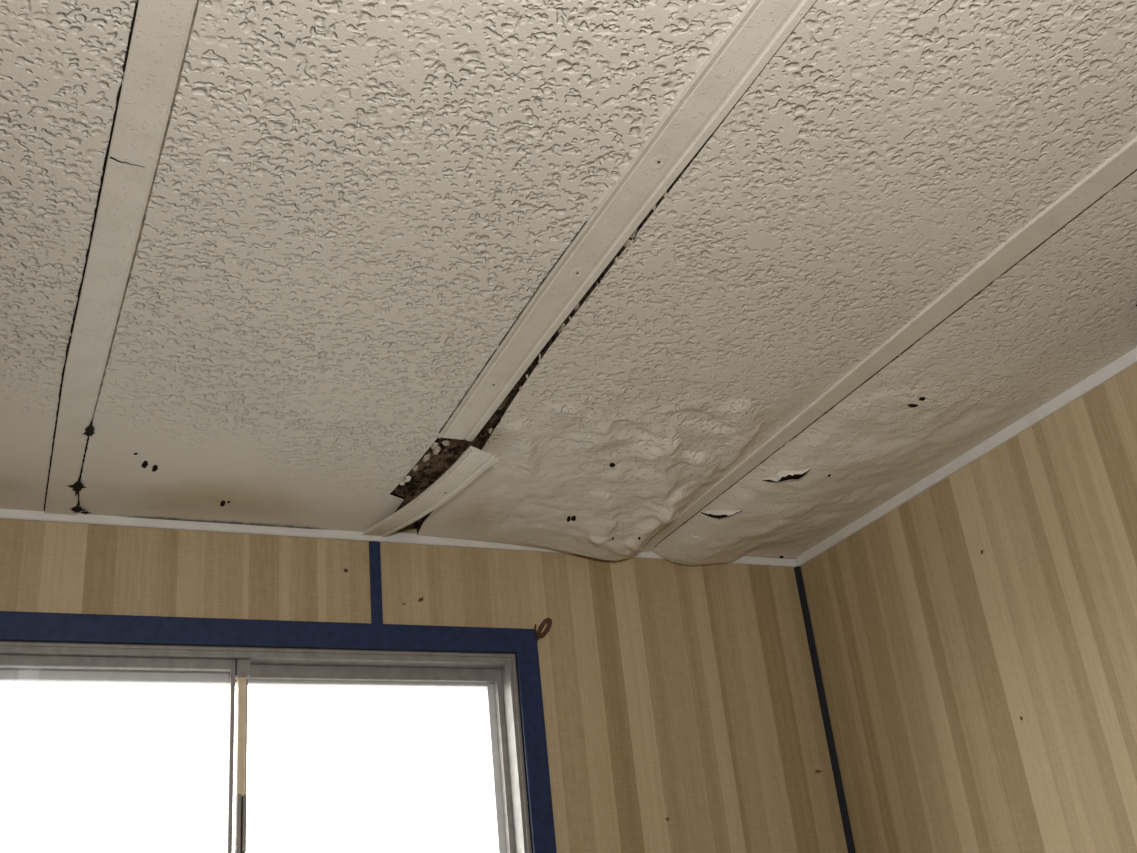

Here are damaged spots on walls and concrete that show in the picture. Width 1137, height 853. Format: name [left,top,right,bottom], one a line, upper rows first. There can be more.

crack [762,468,811,483]
damp [67,476,90,514]
crack [701,510,742,521]